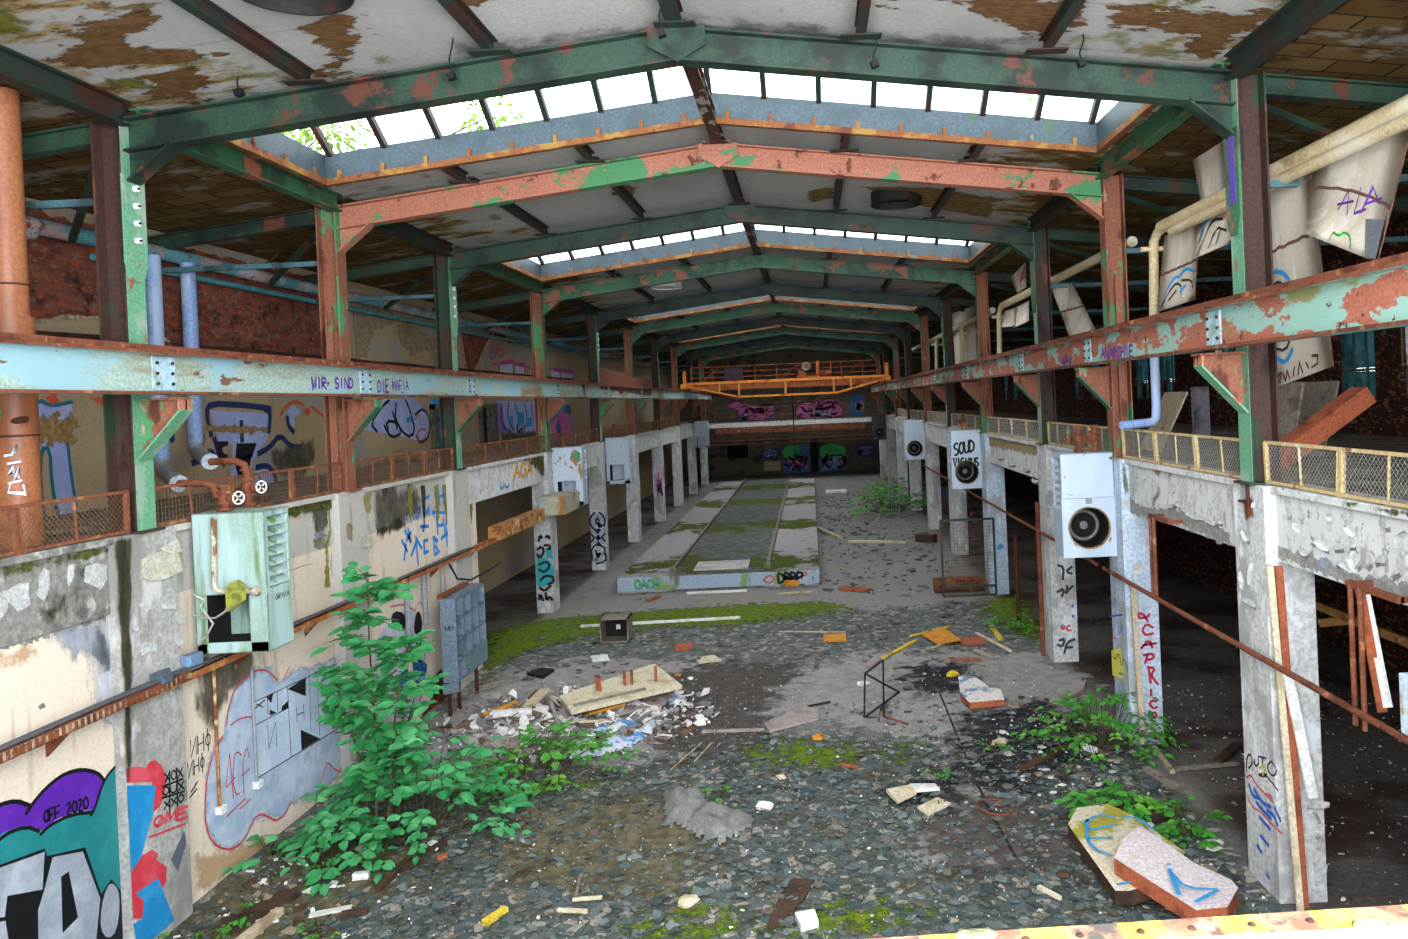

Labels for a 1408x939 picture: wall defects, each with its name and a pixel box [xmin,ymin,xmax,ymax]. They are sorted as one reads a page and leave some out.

peeling [41,1,230,105]
peeling [295,14,386,81]
peeling [938,0,1089,36]
peeling [1106,3,1277,63]
peeling [1130,478,1250,546]
peeling [0,568,50,617]
peeling [67,563,107,589]
peeling [140,538,183,582]
peeling [1237,563,1256,610]
peeling [1278,516,1408,596]
spalling [0,616,106,649]
peeling [132,601,184,656]